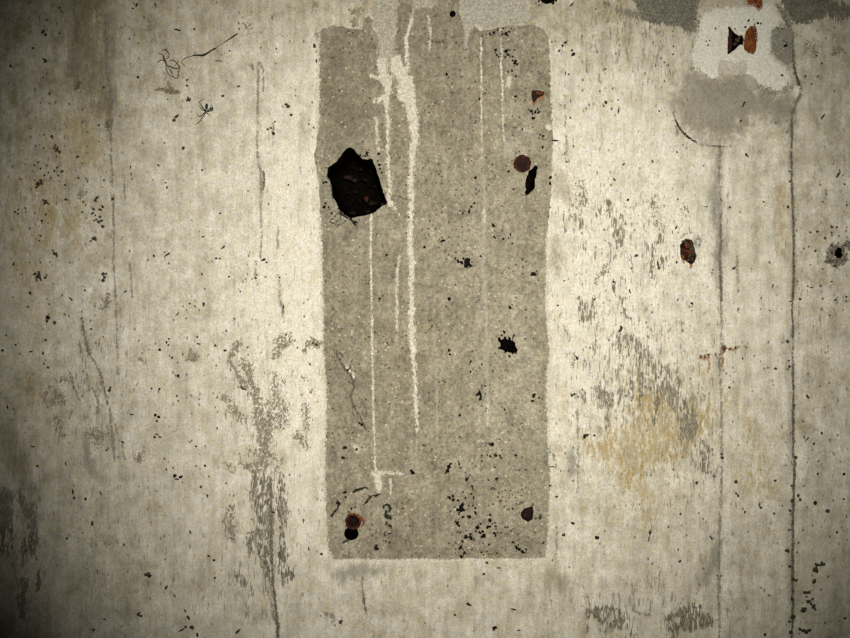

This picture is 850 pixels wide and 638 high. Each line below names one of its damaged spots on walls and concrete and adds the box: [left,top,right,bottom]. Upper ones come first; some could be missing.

efflorescence [369,213,405,495]
efflorescence [369,0,420,433]
peeling [271,0,553,560]
rust [680,239,697,268]